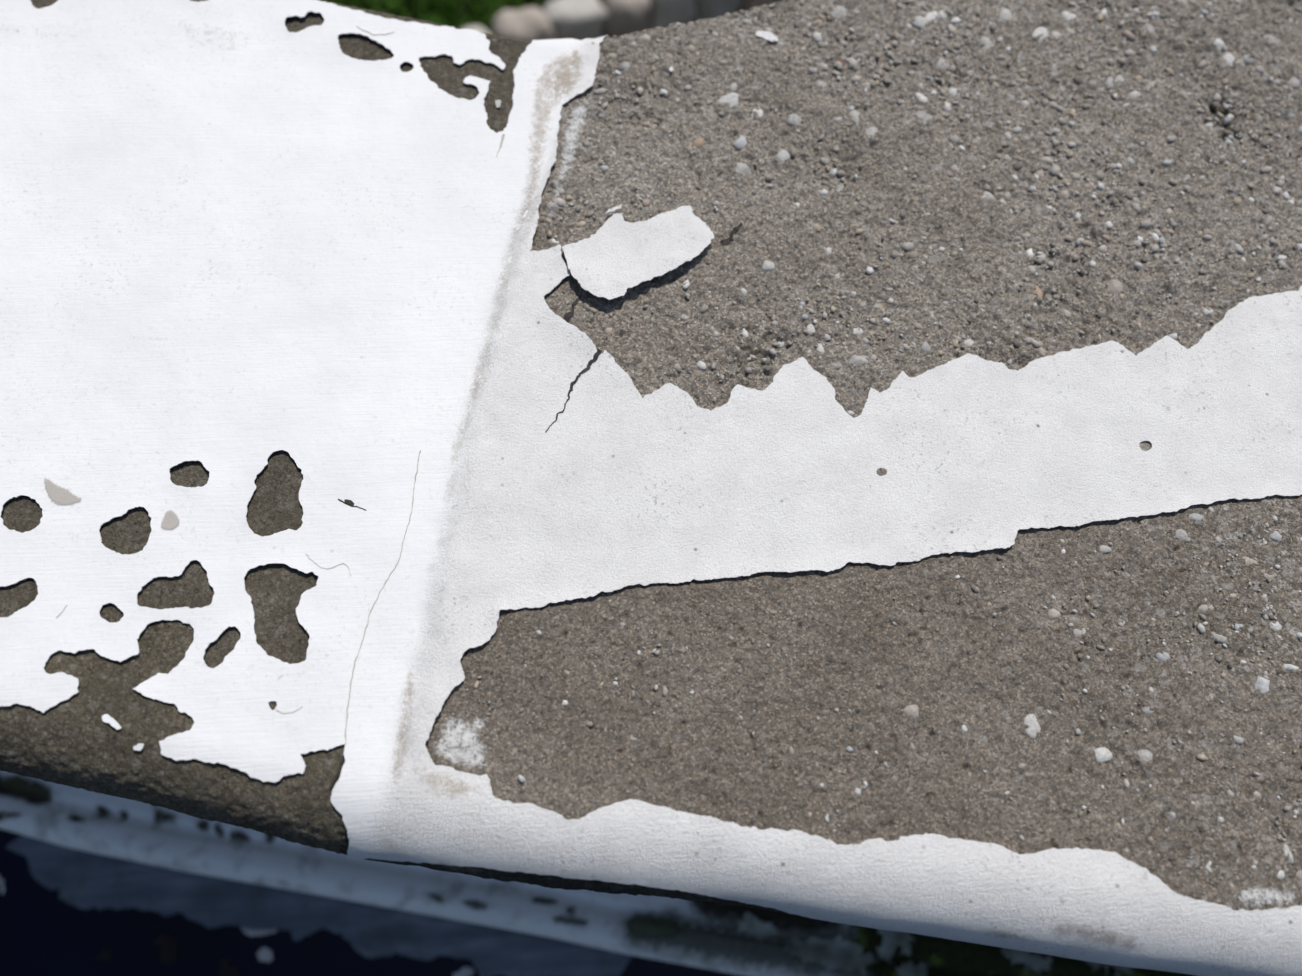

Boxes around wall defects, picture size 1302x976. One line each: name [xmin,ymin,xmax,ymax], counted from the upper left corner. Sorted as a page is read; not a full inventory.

peeling [338,32,531,133]
crack [721,223,742,245]
spalling [531,0,1302,418]
crack [563,296,581,321]
crack [545,349,602,433]
peeling [1,496,43,533]
peeling [100,507,152,554]
peeling [170,461,209,487]
peeling [246,450,303,537]
peeling [0,560,349,855]
spalling [425,495,1302,911]
peeling [363,858,790,914]